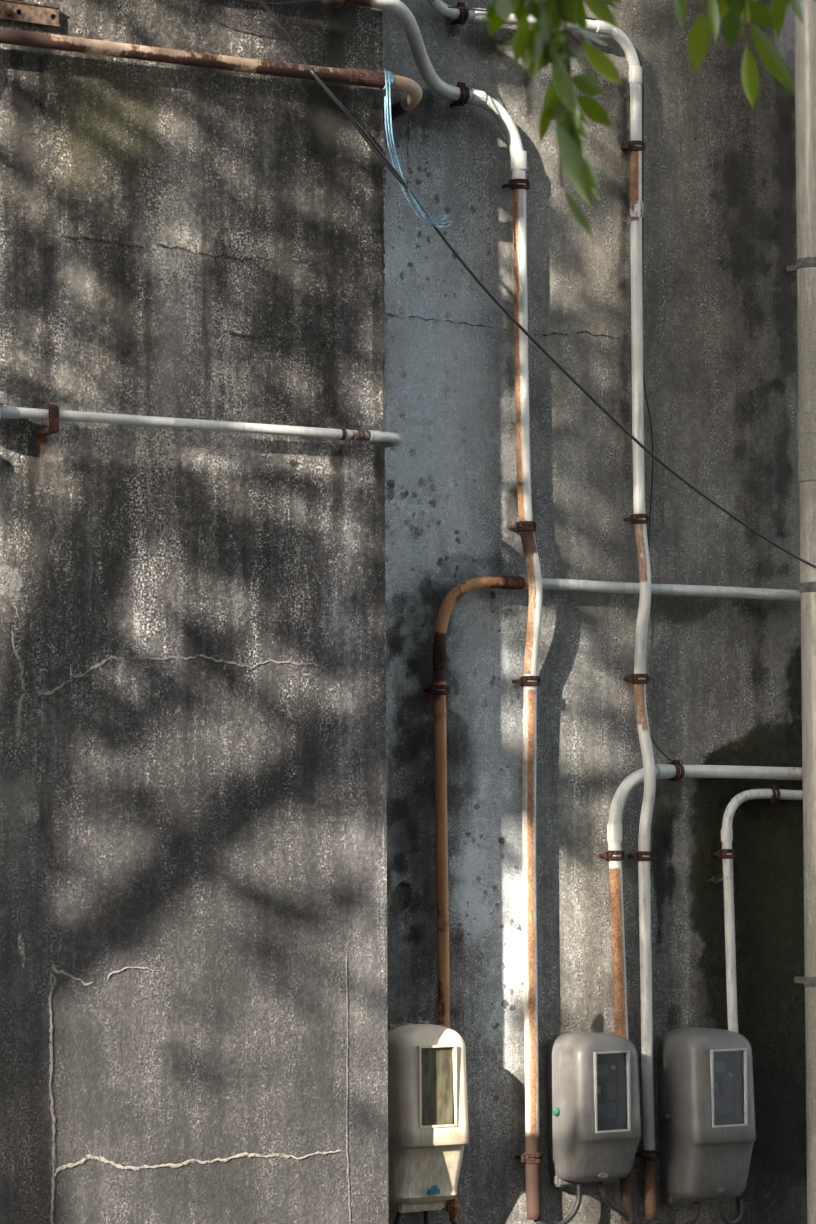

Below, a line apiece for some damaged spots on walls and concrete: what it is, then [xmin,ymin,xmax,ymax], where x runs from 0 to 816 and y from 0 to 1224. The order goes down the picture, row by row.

damp [9,48,54,199]
damp [200,0,357,315]
crack [379,122,619,425]
damp [710,129,778,341]
damp [26,432,51,501]
damp [329,450,343,553]
damp [374,447,383,487]
damp [735,379,791,545]
crack [11,603,316,743]
damp [386,595,407,670]
damp [386,794,422,883]
crack [48,953,351,1224]